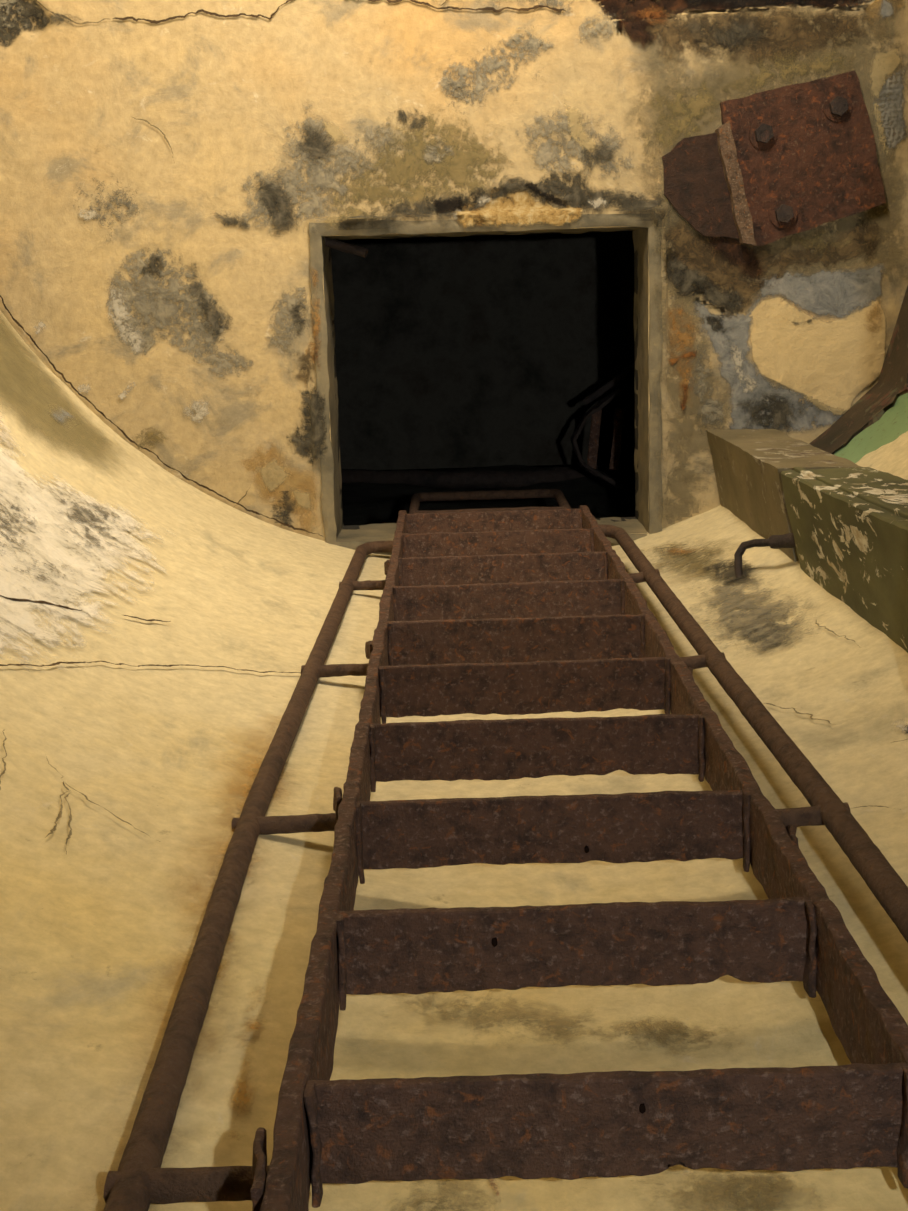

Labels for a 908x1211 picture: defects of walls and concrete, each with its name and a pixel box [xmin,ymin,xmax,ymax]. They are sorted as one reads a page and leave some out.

crack [36,0,292,25]
crack [368,0,573,13]
rust [623,8,866,63]
water stain [216,3,908,524]
water stain [0,314,108,456]
peeling [694,265,886,431]
water stain [0,418,165,667]
water stain [653,543,801,650]
crack [0,730,8,790]
crack [46,756,160,854]
crack [0,661,300,673]
crack [766,703,831,724]